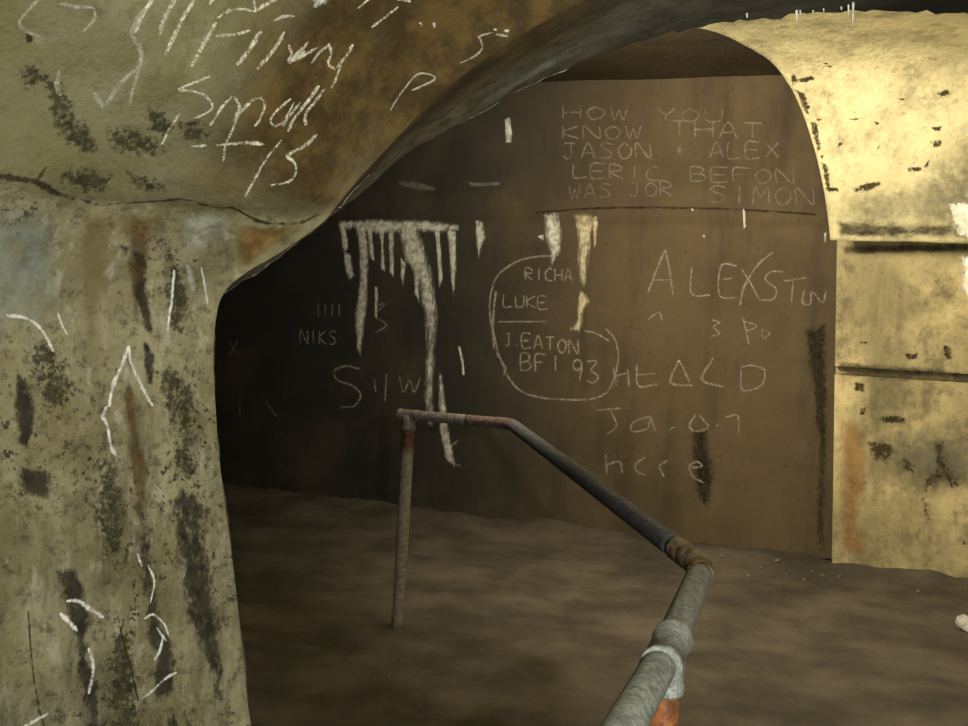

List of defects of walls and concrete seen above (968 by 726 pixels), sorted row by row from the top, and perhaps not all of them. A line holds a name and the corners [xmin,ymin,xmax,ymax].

corrosion [131,221,146,295]
damp [476,221,485,254]
damp [538,214,560,261]
damp [574,214,598,331]
damp [920,190,968,237]
damp [15,374,34,446]
damp [101,346,153,455]
corrosion [125,386,145,515]
damp [339,220,458,466]
damp [59,571,104,726]
damp [142,518,176,697]
damp [173,490,223,698]